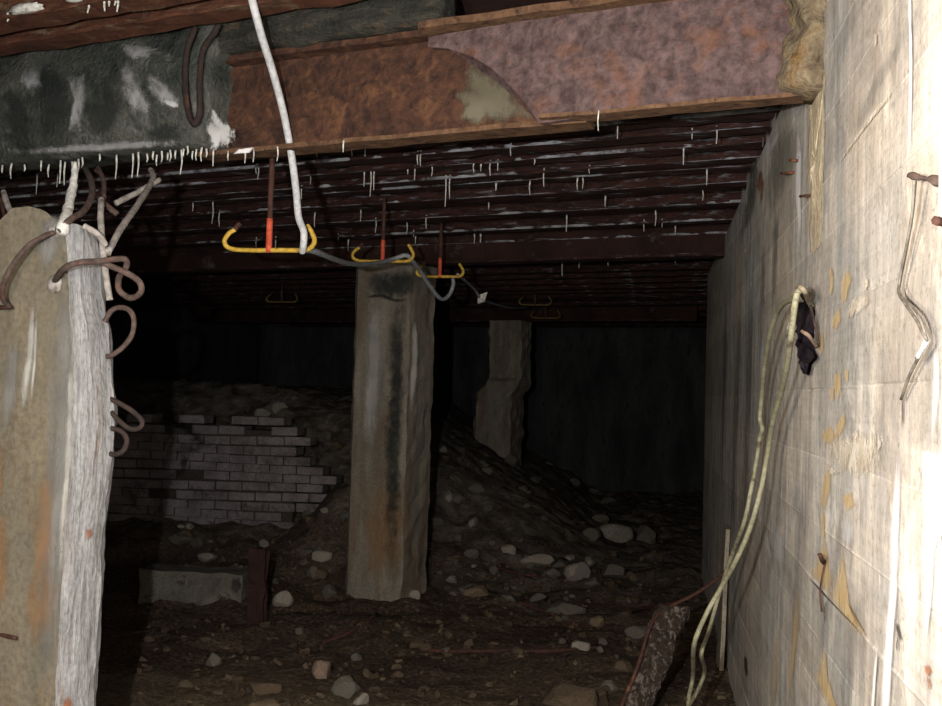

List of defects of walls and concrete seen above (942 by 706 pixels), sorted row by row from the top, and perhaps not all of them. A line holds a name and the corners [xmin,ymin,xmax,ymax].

damp [372,275,413,296]
damp [365,314,380,431]
damp [387,327,417,519]
crack [812,582,857,629]